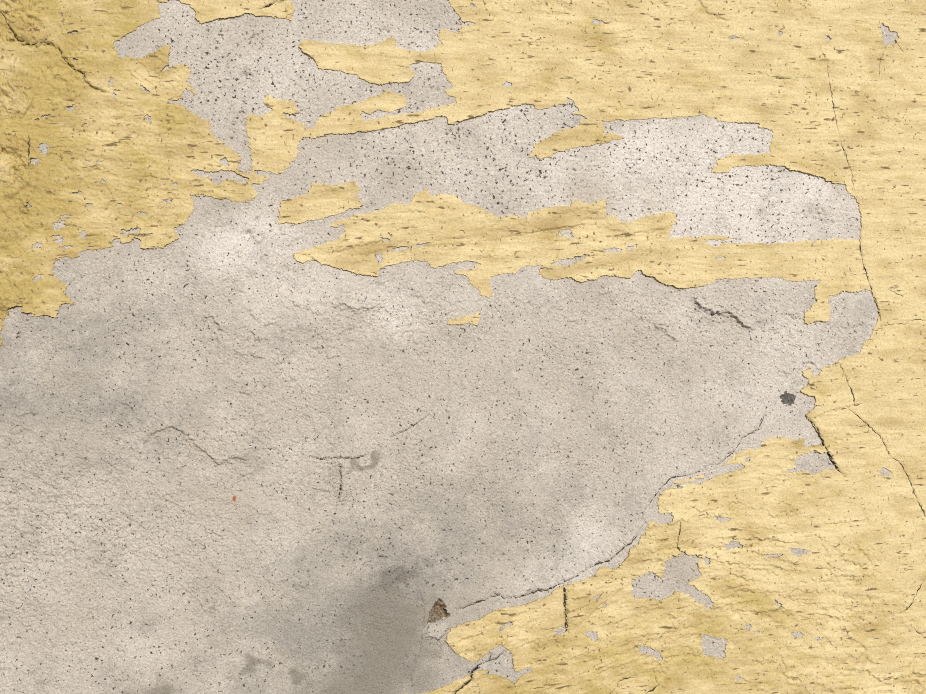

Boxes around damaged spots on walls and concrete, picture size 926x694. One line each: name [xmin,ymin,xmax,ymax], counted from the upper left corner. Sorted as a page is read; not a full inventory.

peeling [113,0,475,175]
peeling [306,97,568,138]
peeling [529,117,625,159]
peeling [293,189,872,325]
crack [860,243,926,326]
spalling [144,431,219,468]
spalling [328,464,342,501]
crack [809,420,840,472]
peeling [805,407,892,477]
crack [841,367,925,516]
crack [458,414,765,631]
peeling [446,585,567,662]